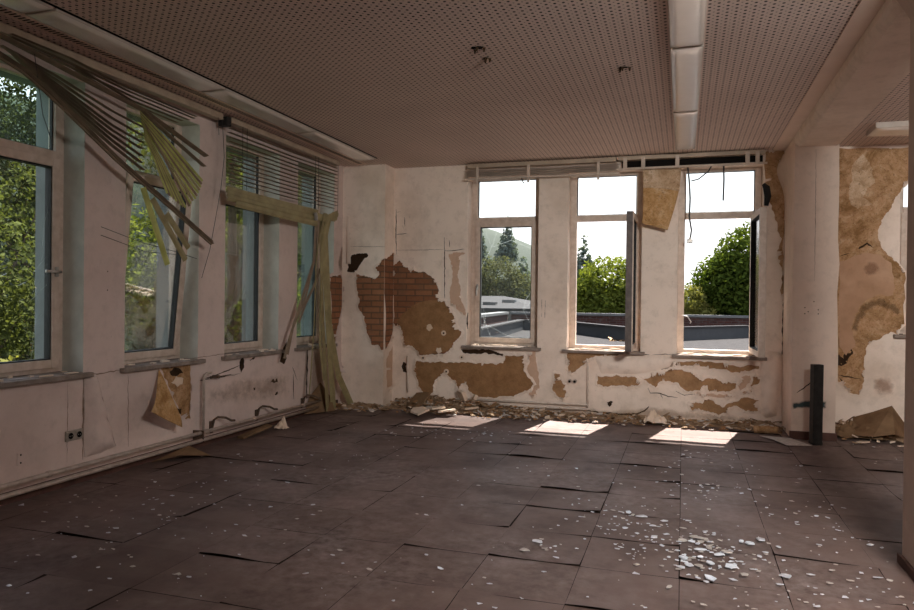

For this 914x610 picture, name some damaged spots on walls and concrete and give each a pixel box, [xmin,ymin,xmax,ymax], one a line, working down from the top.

peeling [642,168,681,230]
flaking render [330,250,786,434]
flaking render [838,349,853,366]
peeling [151,365,192,427]
flaking render [835,416,904,447]